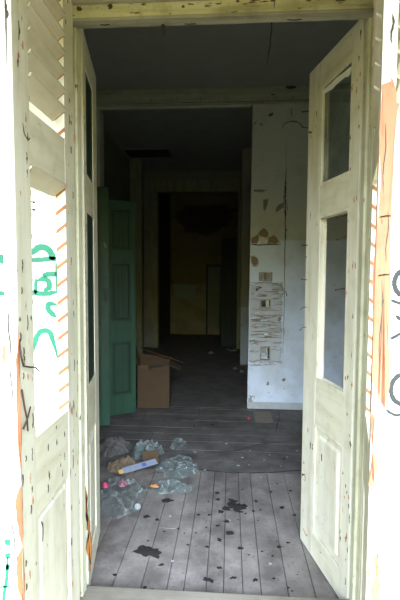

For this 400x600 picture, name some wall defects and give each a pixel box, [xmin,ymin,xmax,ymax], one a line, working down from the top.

crack [281,174,289,306]
peeling [249,282,284,366]